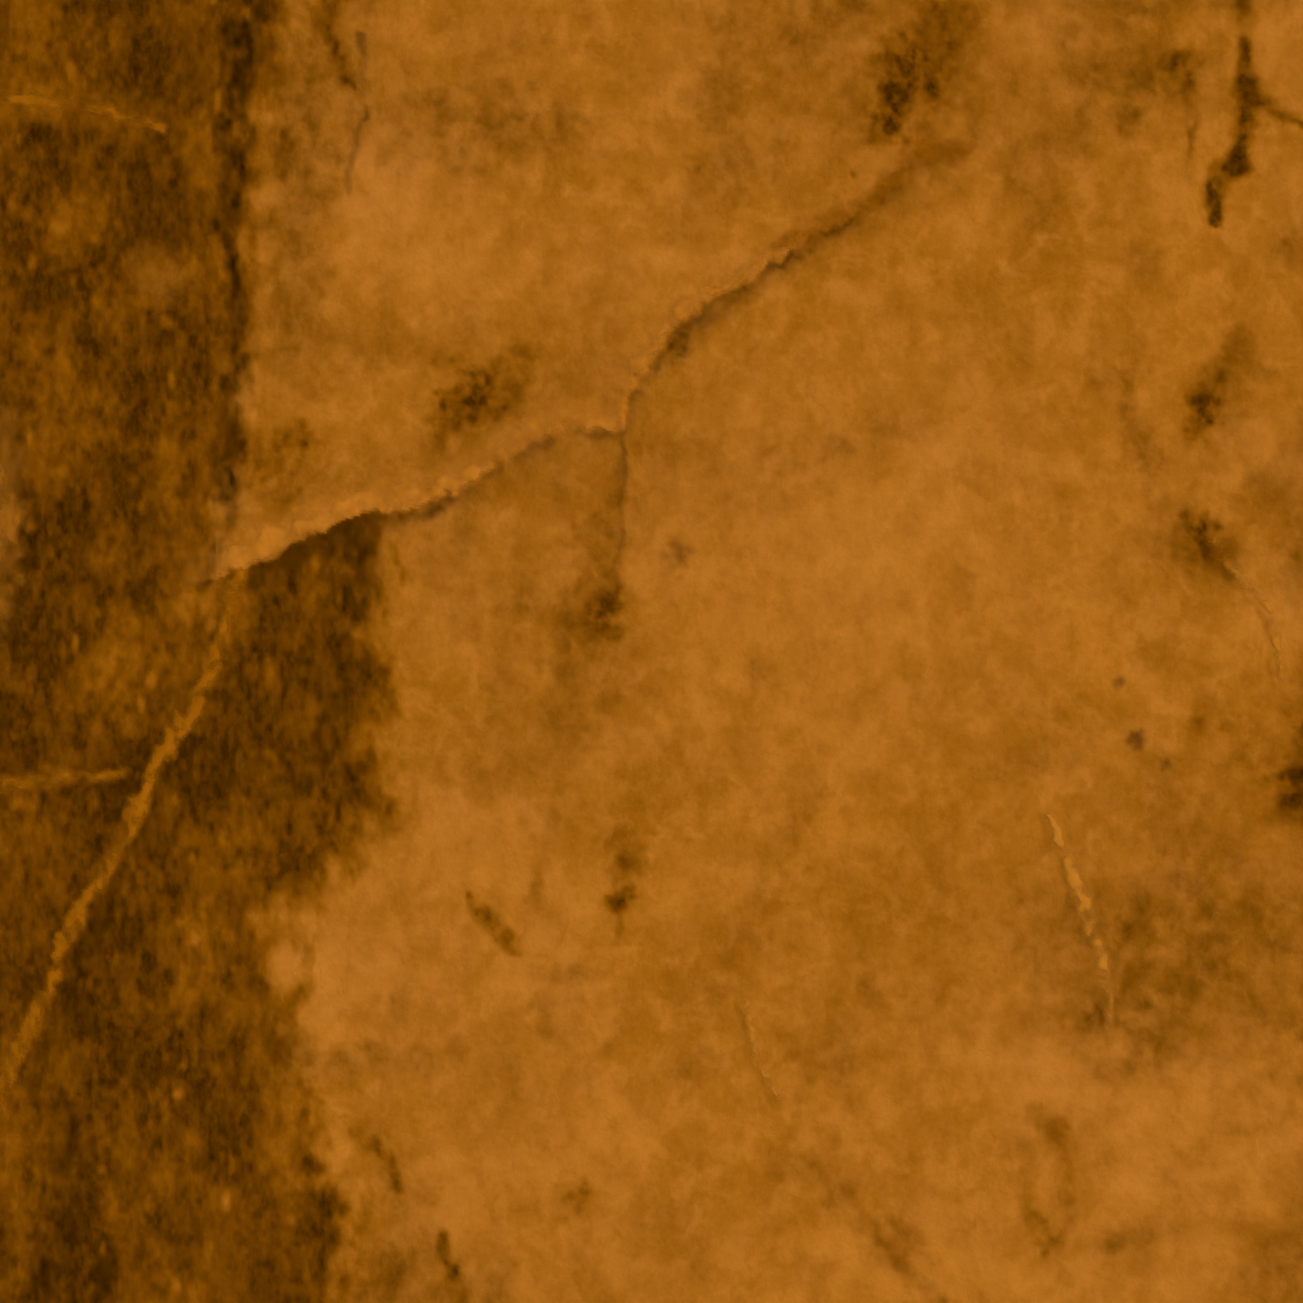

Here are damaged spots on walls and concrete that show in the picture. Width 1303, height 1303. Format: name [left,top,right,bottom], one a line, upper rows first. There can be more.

water stain [0,0,389,1303]
crack [0,242,799,1104]
water stain [1281,768,1303,808]